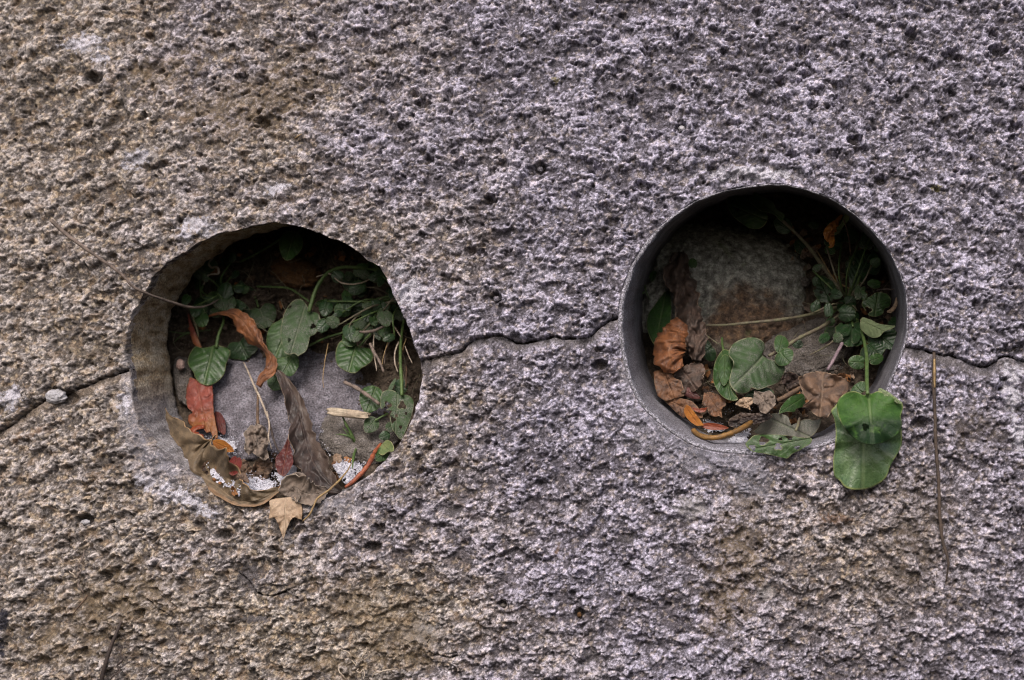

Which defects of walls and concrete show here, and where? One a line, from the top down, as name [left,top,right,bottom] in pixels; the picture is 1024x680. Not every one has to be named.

crack [510,313,618,345]
crack [905,346,1022,368]